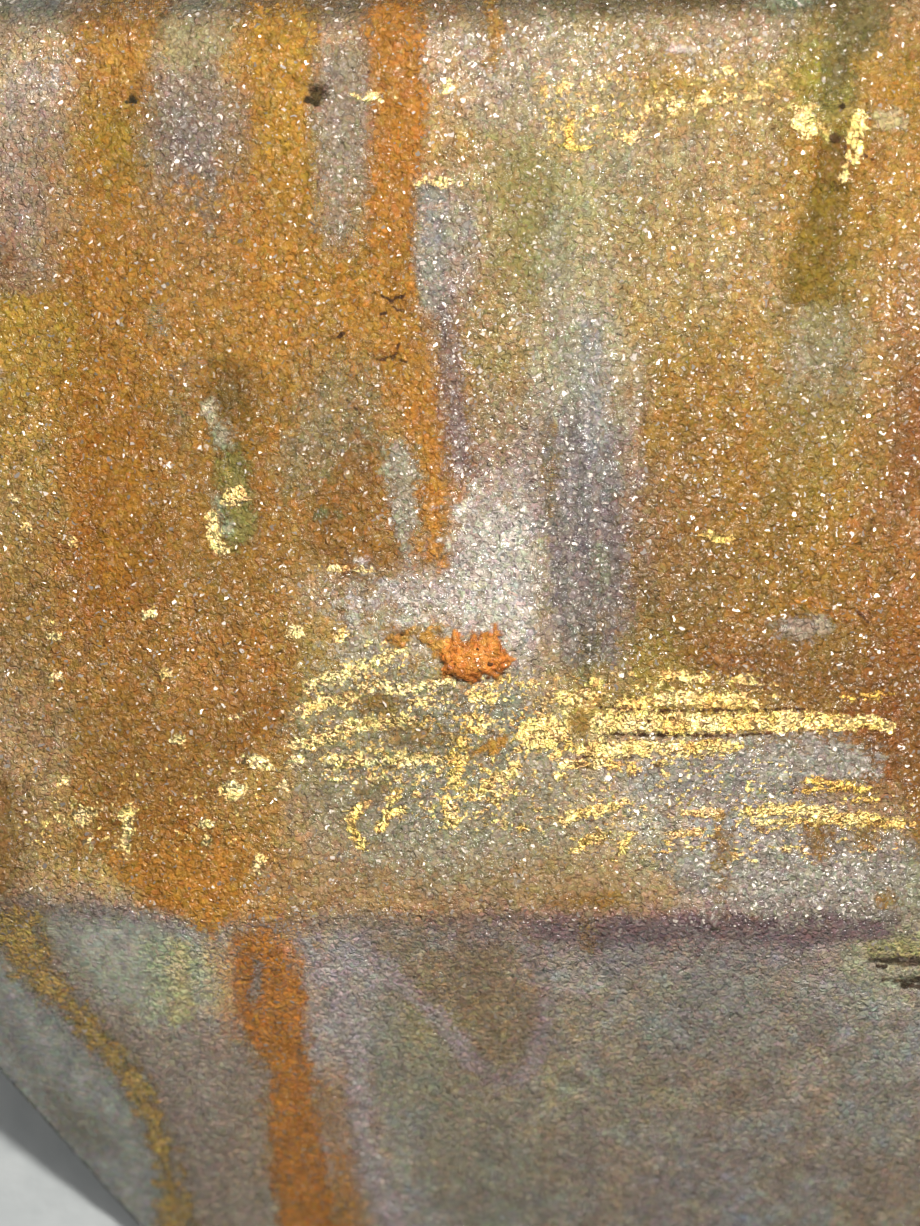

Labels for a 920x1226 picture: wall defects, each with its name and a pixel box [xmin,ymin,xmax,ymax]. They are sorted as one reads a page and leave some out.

leakage [656,0,893,306]
leakage [869,105,909,134]
rust [0,0,454,607]
rust [789,595,883,625]
peeling [18,756,283,872]
peeling [284,640,917,866]
rust [687,643,920,860]
rust [97,835,681,1226]